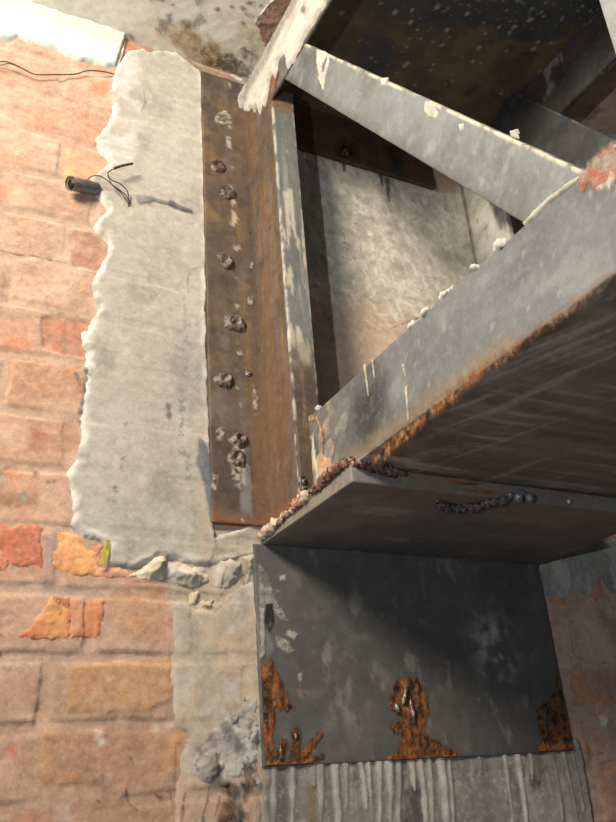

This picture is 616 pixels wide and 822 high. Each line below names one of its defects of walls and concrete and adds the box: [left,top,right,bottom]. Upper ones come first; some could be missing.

water stain [176,23,249,78]
flaking render [230,0,291,47]
rust [309,415,331,481]
spalling [0,523,254,608]
spalling [17,595,105,640]
rust [261,658,324,766]
rust [387,677,461,760]
rust [537,674,573,751]
rust [218,763,260,822]